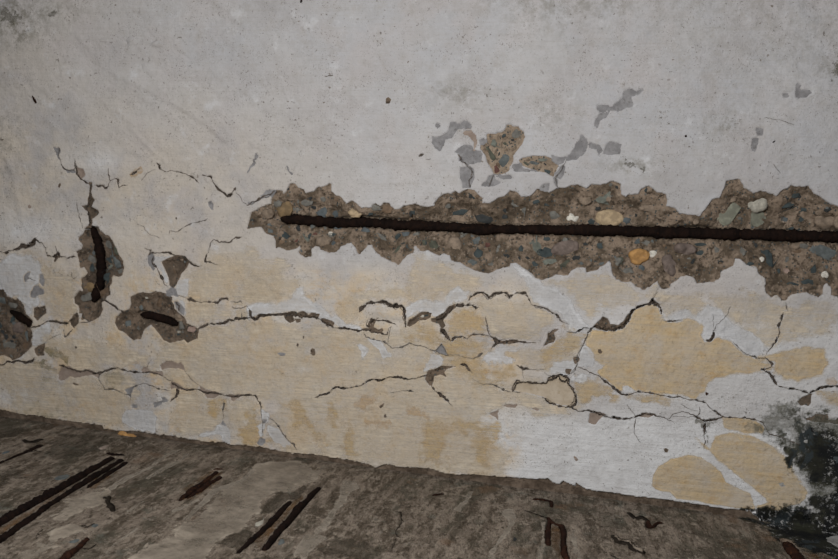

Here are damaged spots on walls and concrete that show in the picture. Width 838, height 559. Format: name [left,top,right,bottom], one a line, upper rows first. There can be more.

peeling [594,89,644,128]
spalling [0,254,51,361]
crack [0,238,76,279]
spalling [65,167,124,328]
spalling [115,252,199,343]
crack [58,150,274,225]
crack [138,219,799,445]
spalling [247,121,838,345]
peeling [669,306,768,354]
crack [734,305,838,393]
crack [59,363,297,450]
water stain [652,393,838,559]